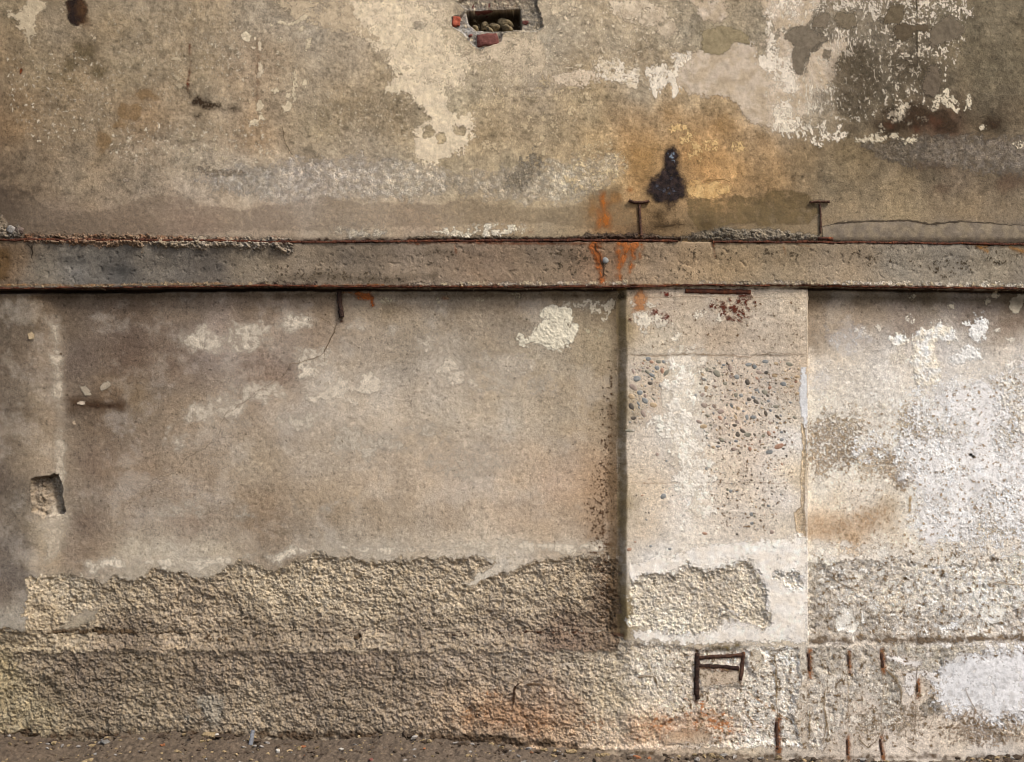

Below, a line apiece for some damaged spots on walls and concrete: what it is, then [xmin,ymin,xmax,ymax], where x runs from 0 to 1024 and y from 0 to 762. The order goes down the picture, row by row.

peeling [7,0,1024,207]
corrosion [279,194,697,323]
corrosion [709,283,1024,322]
spalling [0,215,1024,754]